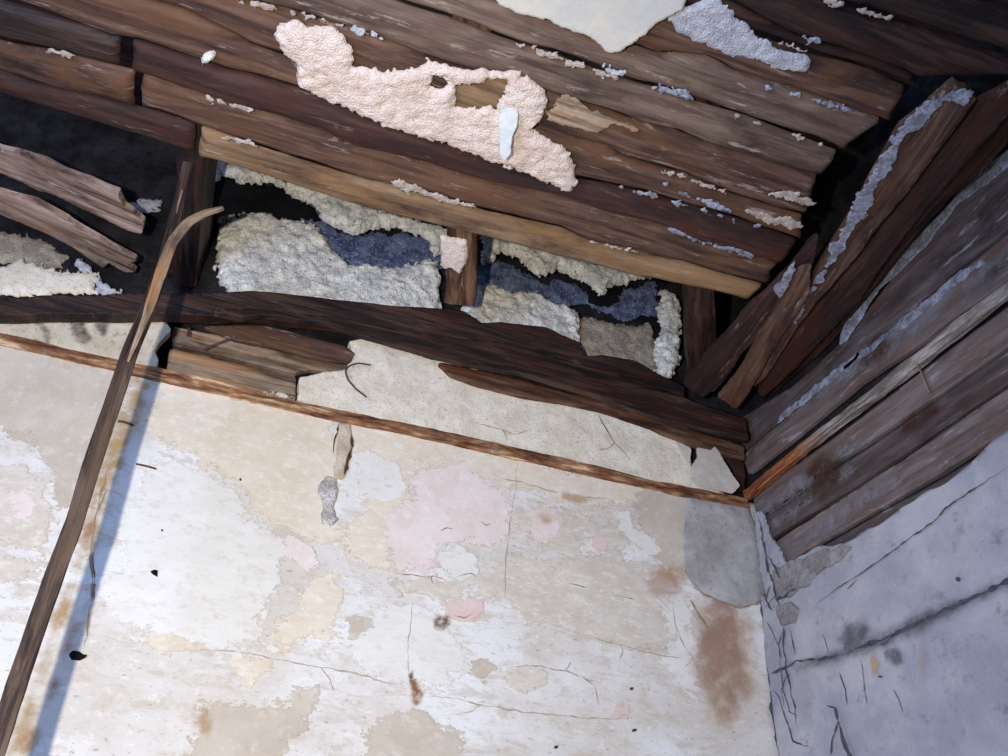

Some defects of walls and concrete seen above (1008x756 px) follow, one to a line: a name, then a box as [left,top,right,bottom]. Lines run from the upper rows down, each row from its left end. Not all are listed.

spalling [135,322,171,367]
peeling [0,322,133,585]
peeling [100,339,740,756]
crack [493,465,607,592]
crack [820,469,1004,601]
crack [430,662,615,720]
water stain [701,599,742,693]
crack [587,510,1008,756]